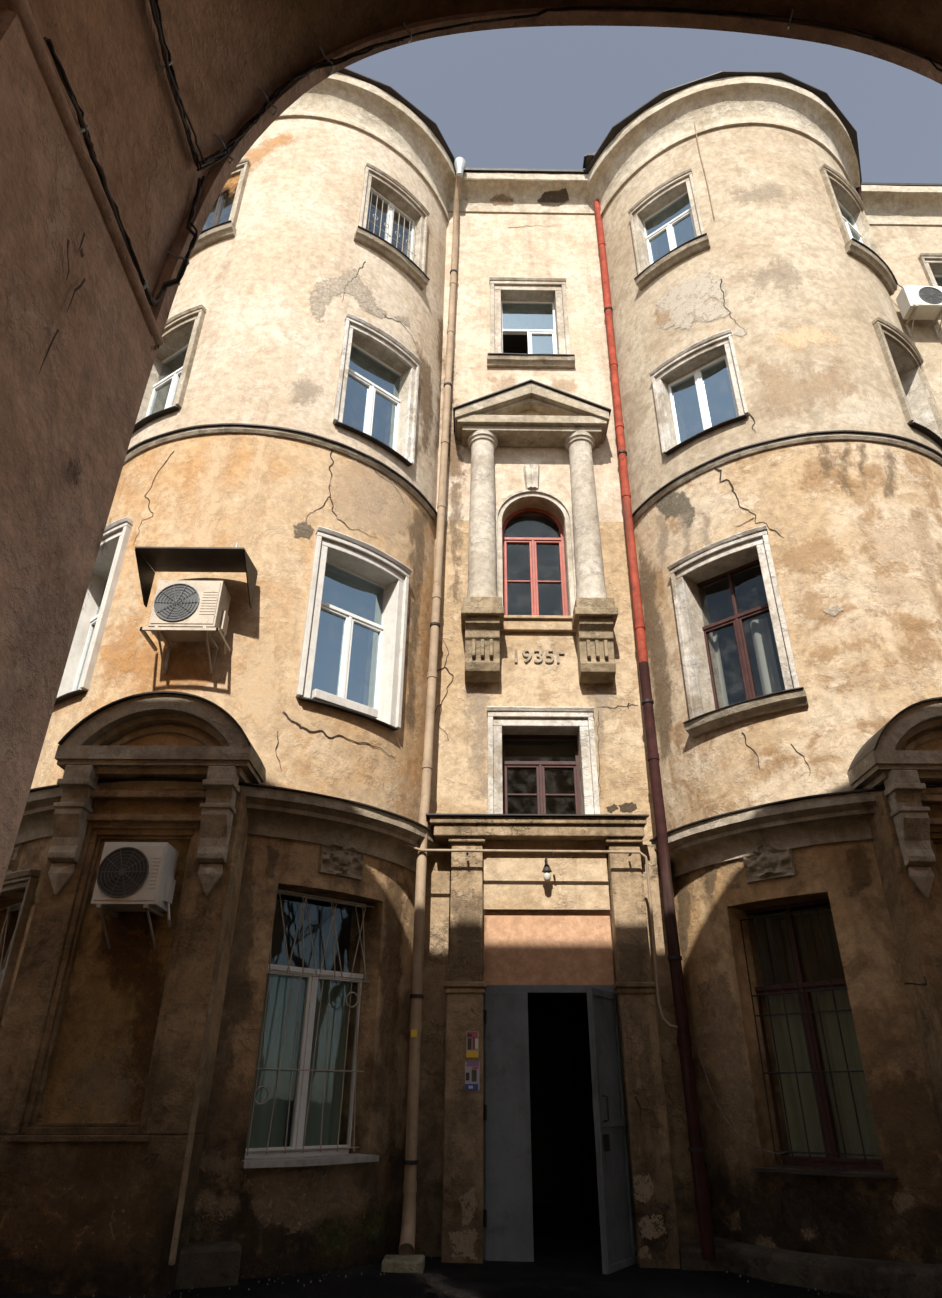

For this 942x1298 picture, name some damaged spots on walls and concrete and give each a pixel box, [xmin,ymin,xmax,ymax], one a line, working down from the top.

peeling [537,187,569,205]
flaking render [308,268,410,328]
flaking render [656,270,747,336]
crack [133,451,174,545]
crack [306,450,377,538]
crack [714,467,784,538]
crack [275,711,396,768]
leakage [379,881,403,1067]
spalling [448,1187,480,1261]
spalling [633,1171,668,1260]